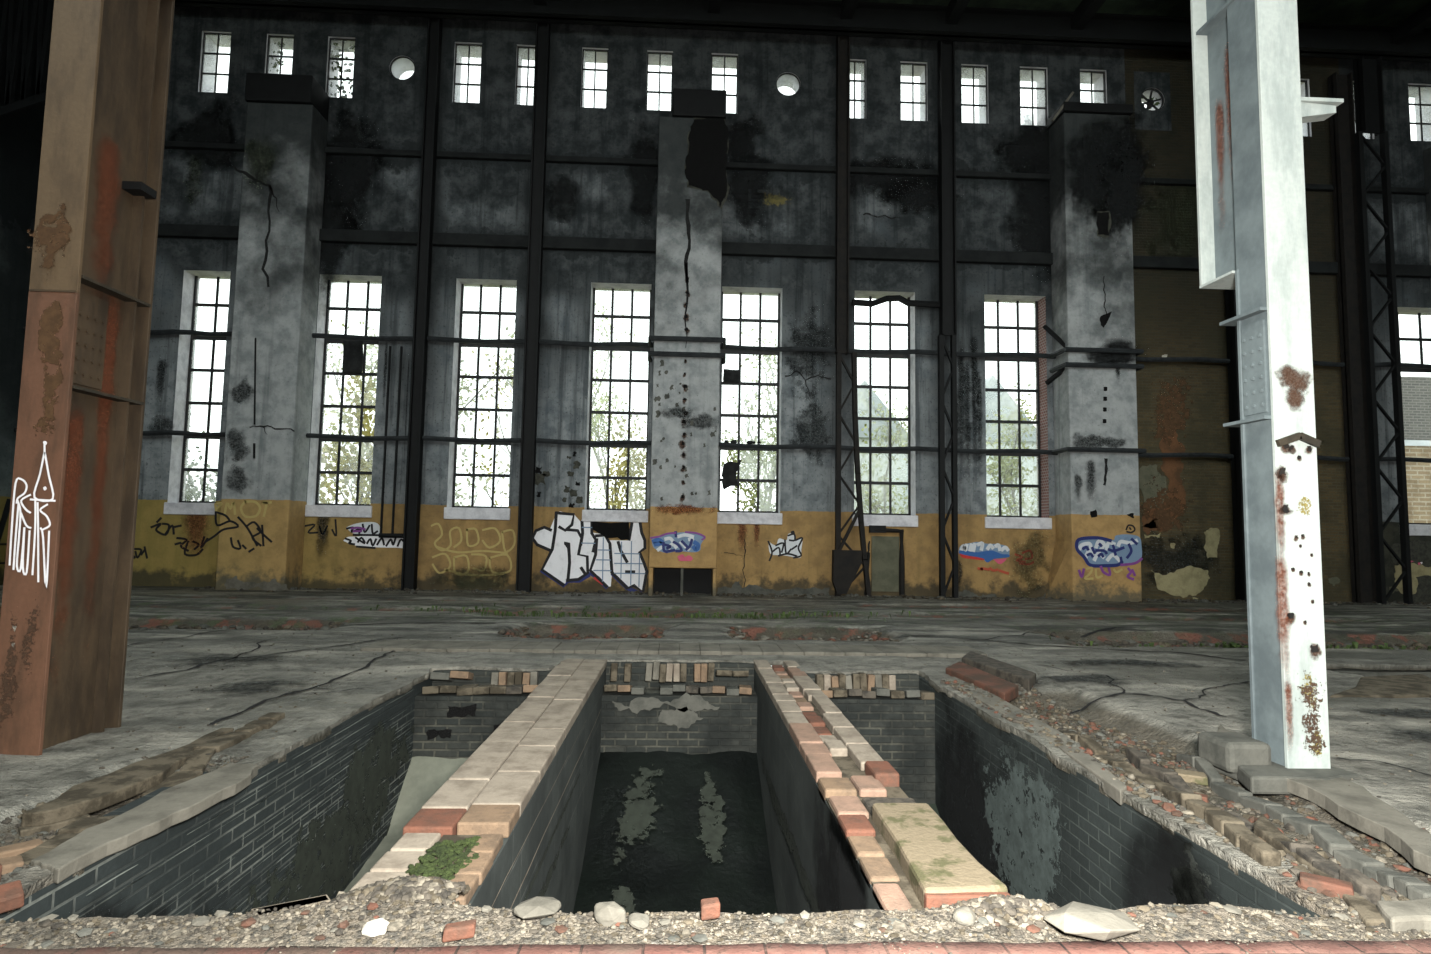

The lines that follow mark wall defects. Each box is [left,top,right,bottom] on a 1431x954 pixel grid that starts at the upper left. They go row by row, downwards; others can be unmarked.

spalling [684,118,730,209]
rust [27,203,72,274]
crack [683,199,691,348]
rust [33,301,64,436]
rust [1279,366,1310,407]
peeling [1127,401,1186,549]
peeling [1151,528,1220,599]
rust [1275,444,1314,642]
crack [127,622,482,725]
crack [897,627,1250,717]
rust [1285,644,1327,757]